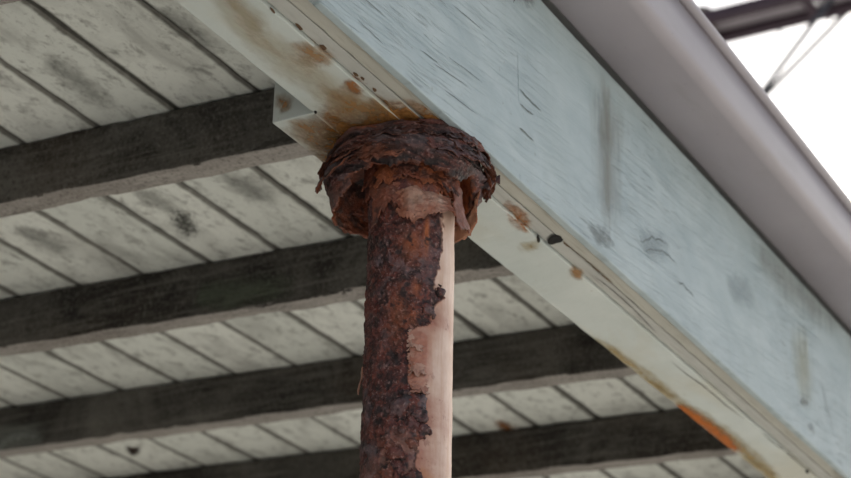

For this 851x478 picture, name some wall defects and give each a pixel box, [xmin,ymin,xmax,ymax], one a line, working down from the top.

rust [315,77,500,244]
mould [171,212,198,237]
rust [510,206,528,232]
crack [641,235,692,294]
rust [608,346,775,478]